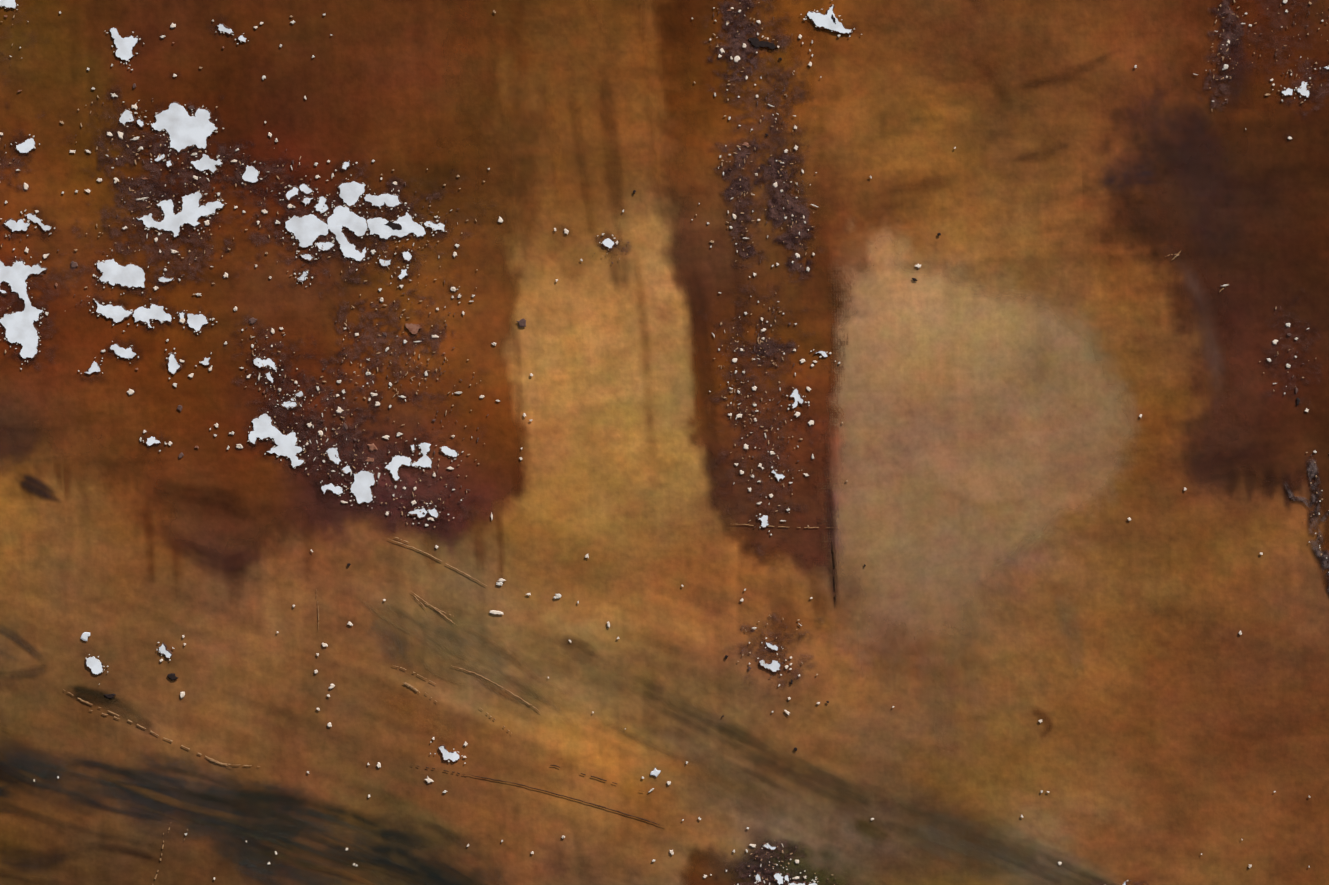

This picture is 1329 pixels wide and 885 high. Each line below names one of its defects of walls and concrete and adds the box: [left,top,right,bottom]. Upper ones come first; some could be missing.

peeling [0,0,29,25]
peeling [212,20,263,49]
peeling [1194,0,1329,111]
peeling [0,201,59,370]
corrosion [0,0,525,571]
peeling [62,27,500,528]
corrosion [661,0,842,579]
corrosion [1110,0,1329,586]
peeling [709,296,840,536]
leakage [833,238,1134,658]
peeling [725,615,803,715]
peeling [703,827,836,885]